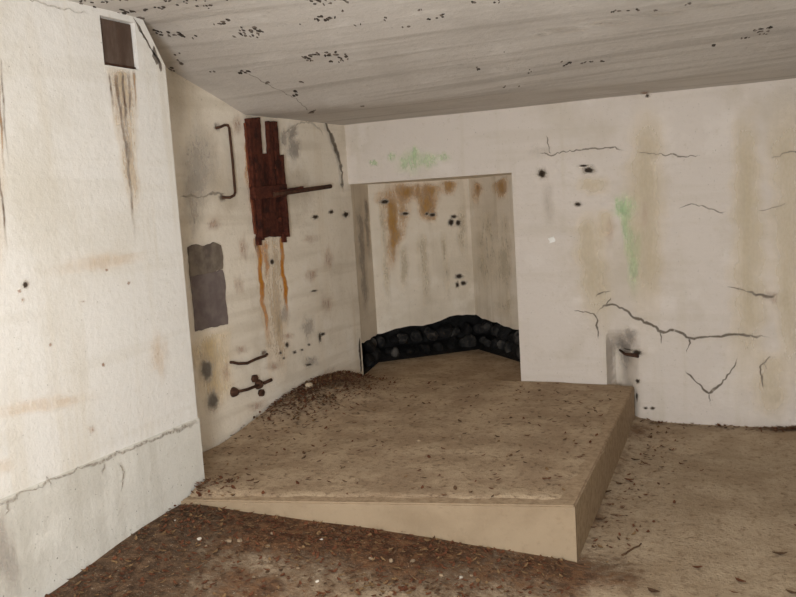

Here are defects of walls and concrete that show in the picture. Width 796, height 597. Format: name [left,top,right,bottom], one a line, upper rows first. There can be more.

crack [542,137,619,156]
crack [640,150,696,158]
rust [254,237,288,351]
crack [577,291,758,351]
crack [687,362,736,399]
crack [6,425,190,514]